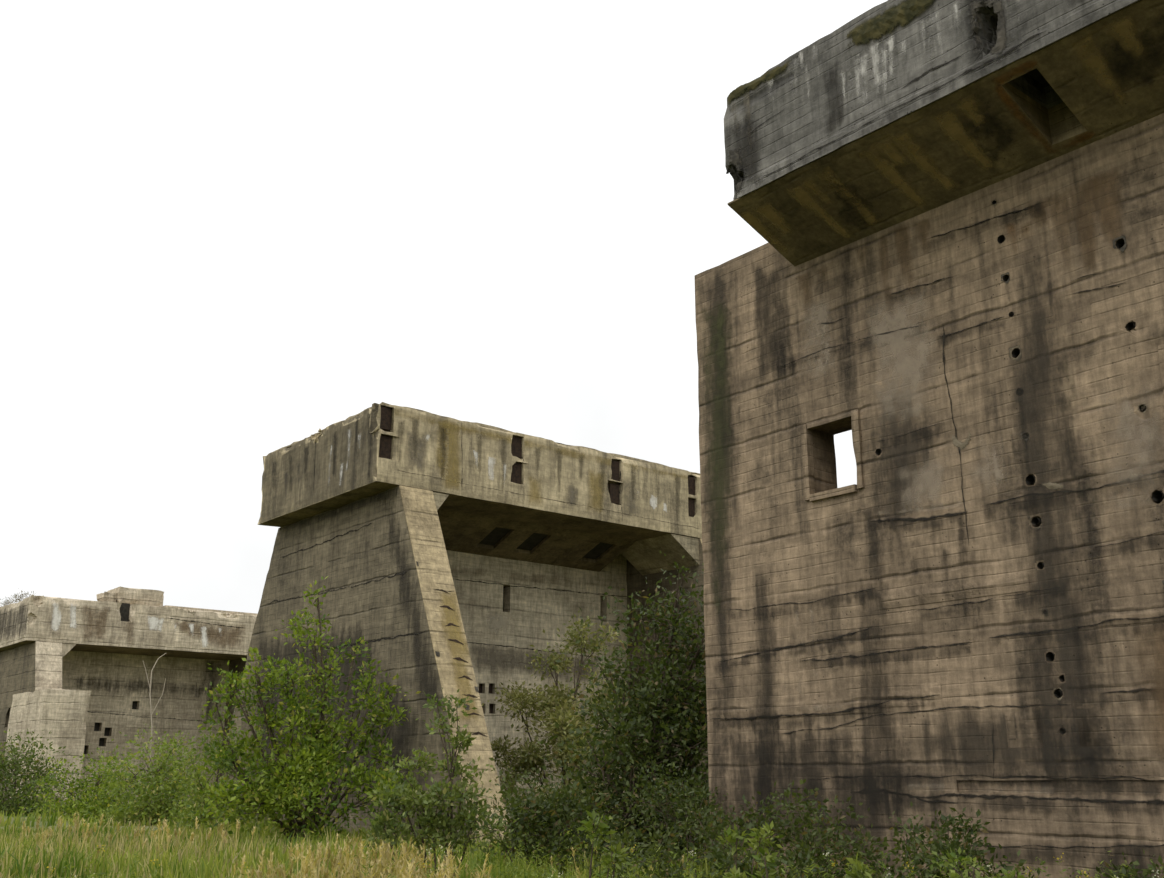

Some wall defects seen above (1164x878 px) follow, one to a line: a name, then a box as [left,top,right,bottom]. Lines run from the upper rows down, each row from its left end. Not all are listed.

damp [829,38,903,128]
damp [399,421,445,469]
damp [474,437,506,478]
damp [705,276,735,683]
damp [867,397,928,577]
crack [775,317,1164,544]
damp [924,258,1118,812]
damp [0,605,28,637]
damp [52,604,106,635]
damp [148,617,240,647]
damp [715,579,935,864]